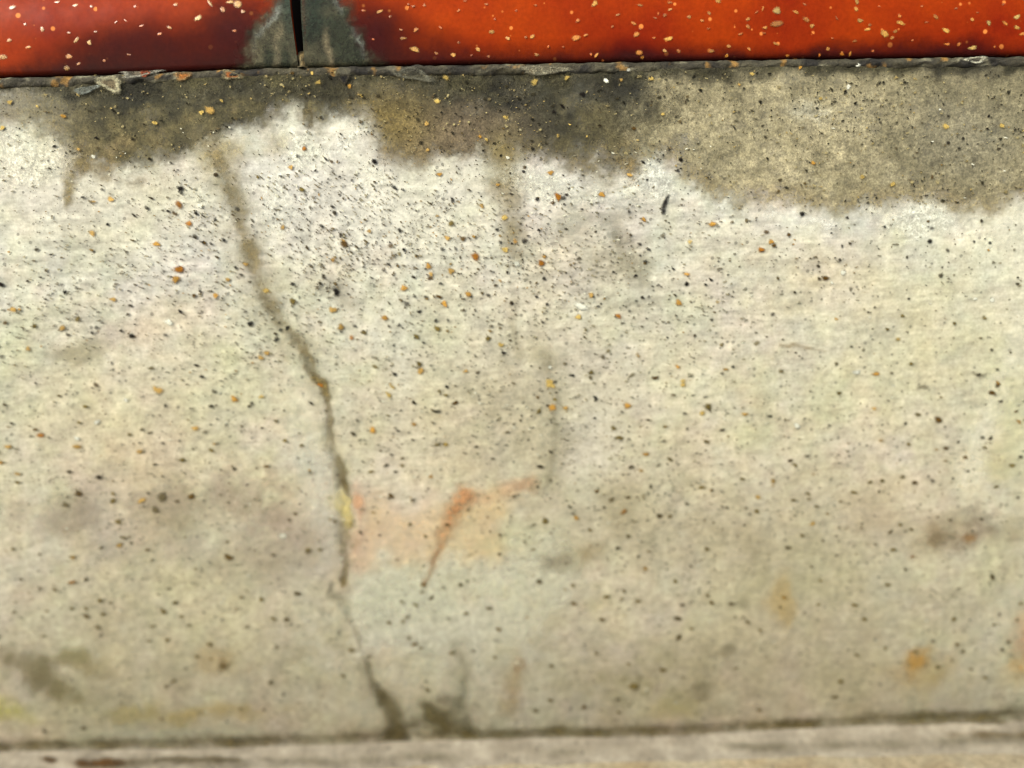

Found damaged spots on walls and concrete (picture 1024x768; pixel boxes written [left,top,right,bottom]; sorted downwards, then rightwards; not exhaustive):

water stain [0,0,1024,237]
crack [214,154,259,267]
crack [300,346,347,515]
crack [339,566,347,586]
crack [373,684,403,740]